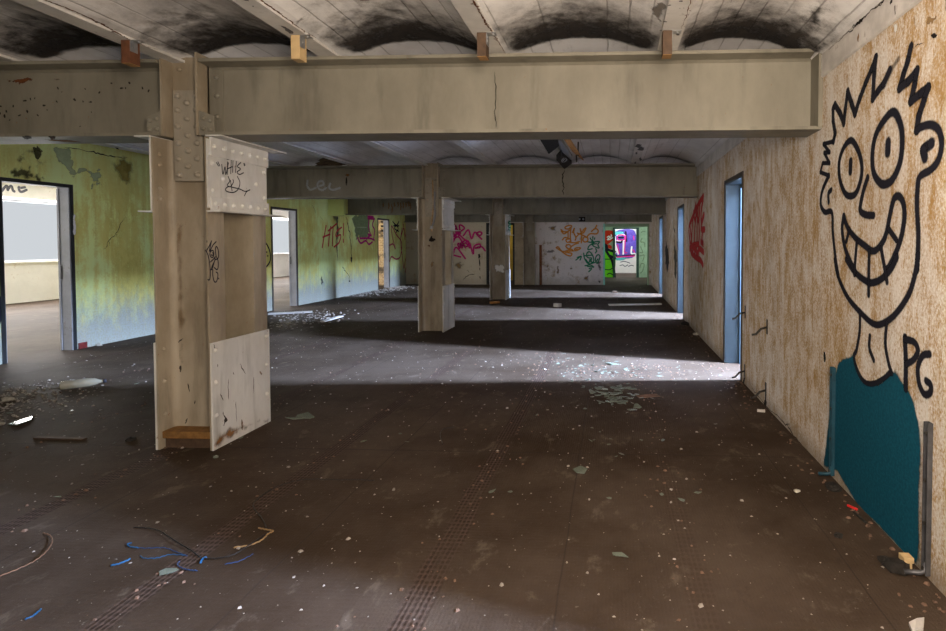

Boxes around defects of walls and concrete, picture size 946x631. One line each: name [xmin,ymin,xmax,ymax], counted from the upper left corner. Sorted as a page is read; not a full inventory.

damp [653,3,666,20]